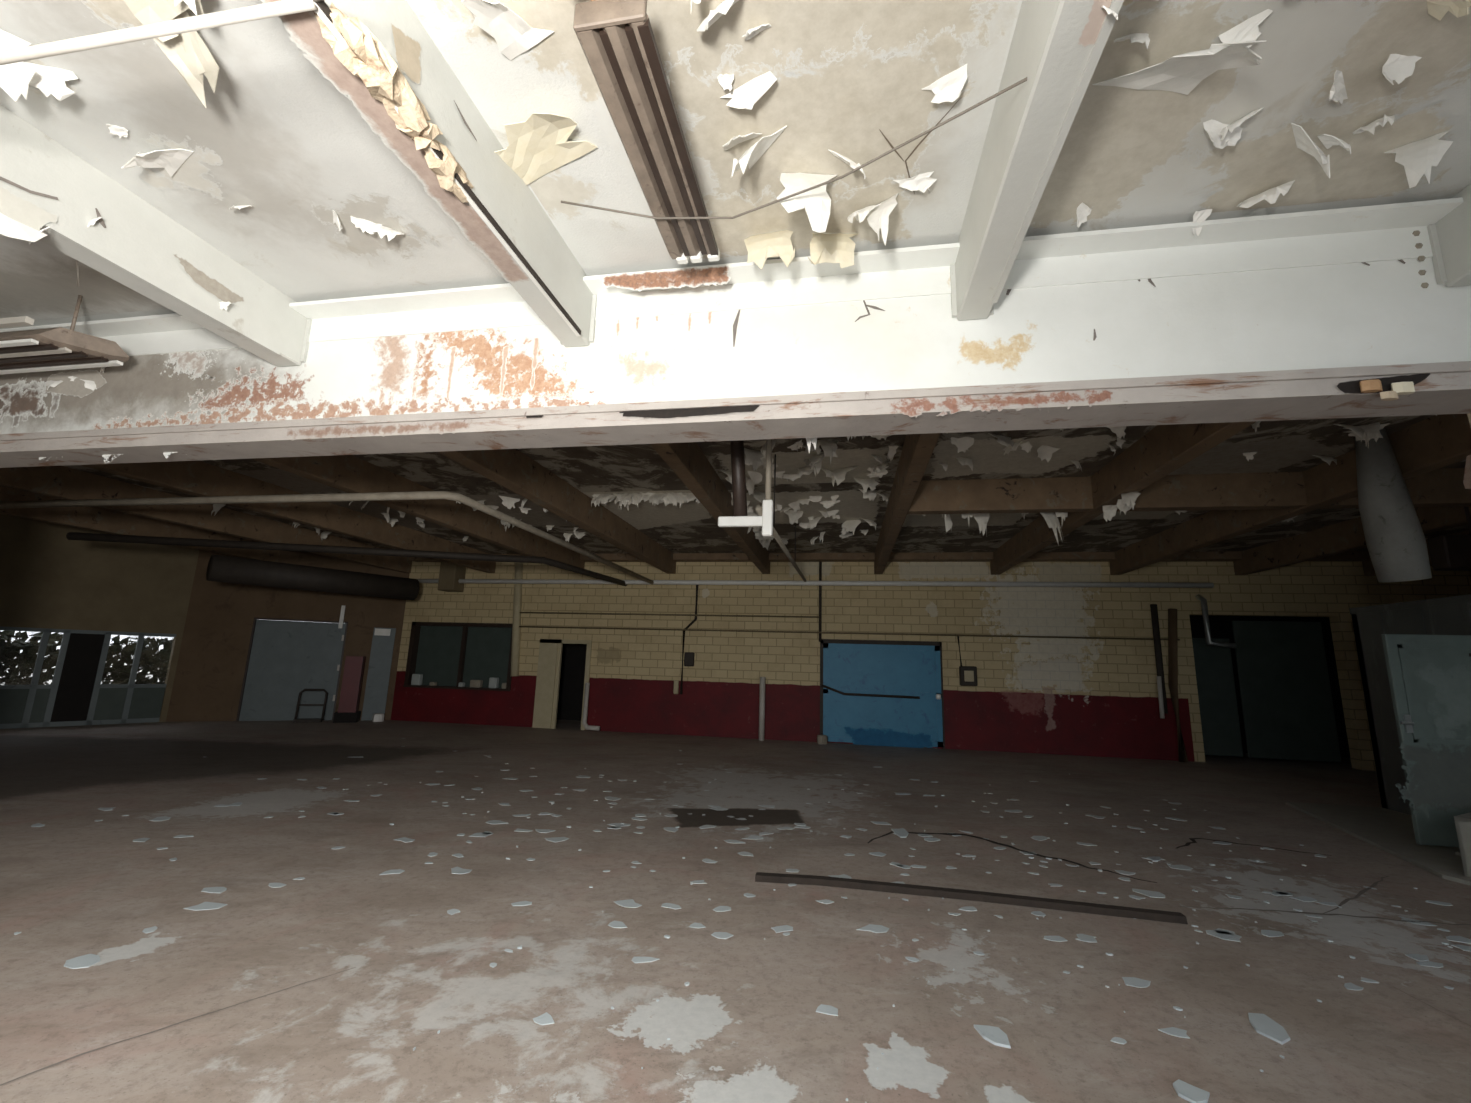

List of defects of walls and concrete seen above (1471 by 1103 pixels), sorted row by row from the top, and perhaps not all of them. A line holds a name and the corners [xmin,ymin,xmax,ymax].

peeling [0,27,83,110]
peeling [81,0,219,108]
spalling [313,2,473,203]
peeling [430,0,603,104]
peeling [646,0,1009,269]
peeling [1028,0,1471,236]
peeling [0,187,58,244]
corrosion [601,263,731,291]
corrosion [0,377,61,428]
corrosion [92,316,760,441]
corrosion [954,320,1041,376]
corrosion [889,388,1123,418]